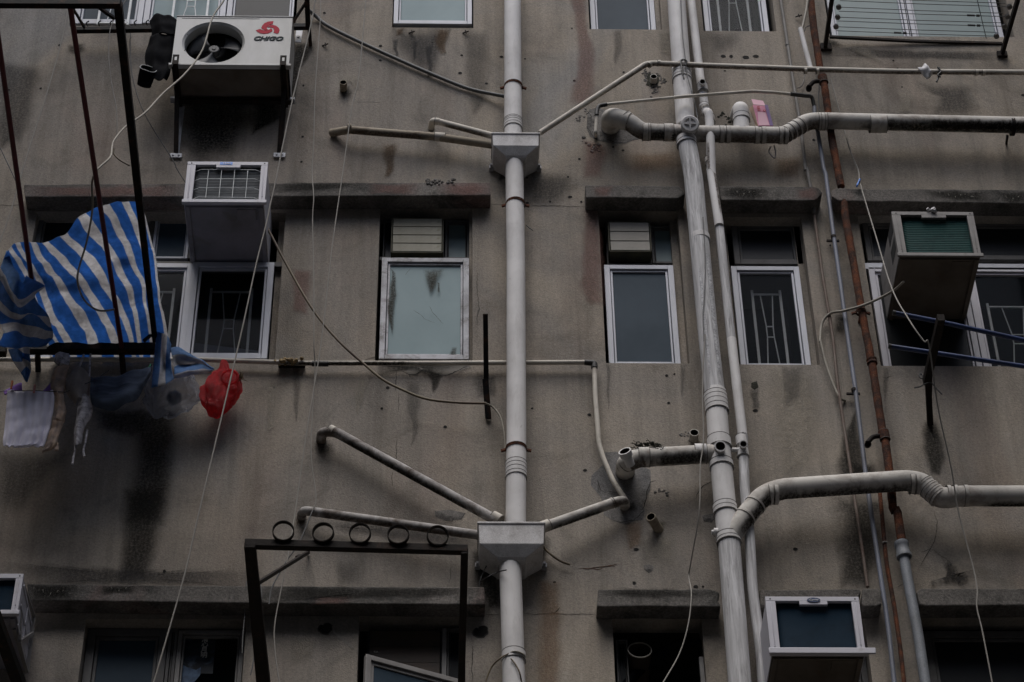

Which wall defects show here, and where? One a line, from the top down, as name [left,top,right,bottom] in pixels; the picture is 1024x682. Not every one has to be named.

damp [59,412,204,592]
damp [925,424,943,472]